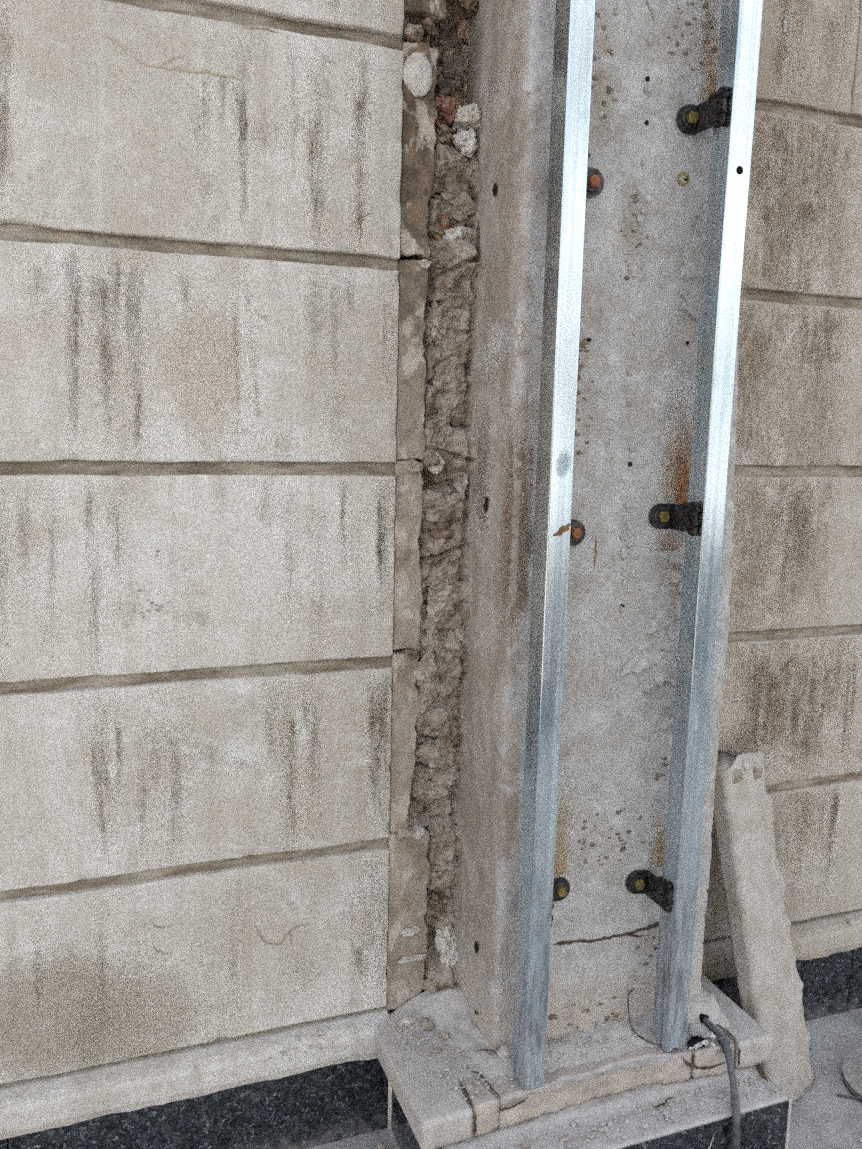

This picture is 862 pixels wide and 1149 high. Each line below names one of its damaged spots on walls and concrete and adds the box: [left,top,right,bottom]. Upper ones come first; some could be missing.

crack [105,34,240,79]
spalling [385,0,484,1014]
corrosion [675,457,688,503]
spalling [667,545,685,621]
leakage [749,660,840,749]
crack [554,922,659,945]